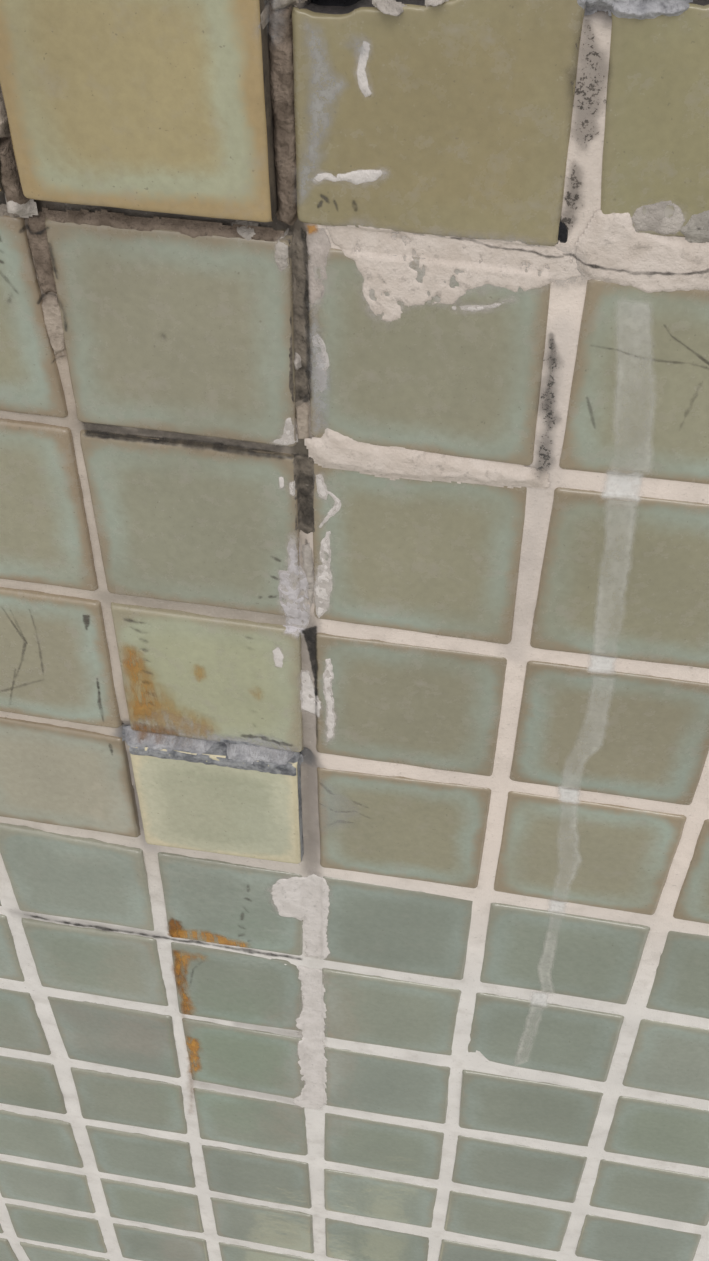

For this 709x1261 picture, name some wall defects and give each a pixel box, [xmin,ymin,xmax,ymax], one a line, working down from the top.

peeling [311,0,407,16]
crack [20,225,58,304]
spalling [557,216,568,244]
corrosion [125,650,174,736]
corrosion [169,919,245,1015]
corrosion [187,1038,200,1071]